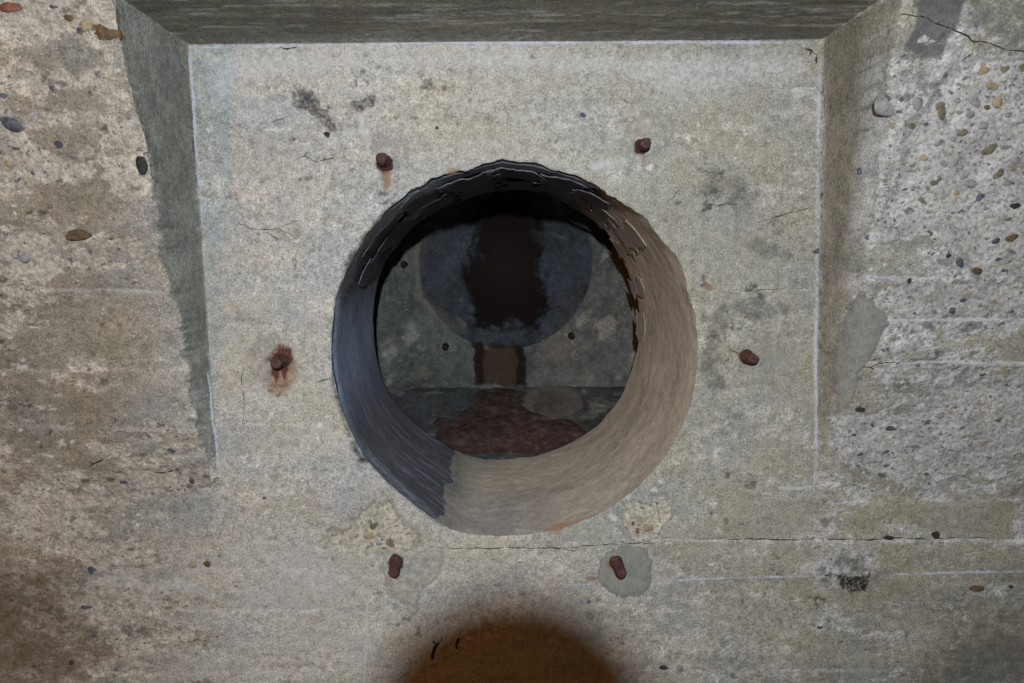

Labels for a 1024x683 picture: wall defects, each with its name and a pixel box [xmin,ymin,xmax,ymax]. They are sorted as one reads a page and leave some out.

crack [899,4,1024,61]
corrosion [376,155,393,174]
corrosion [268,345,293,381]
crack [418,539,700,552]
crack [727,534,983,542]